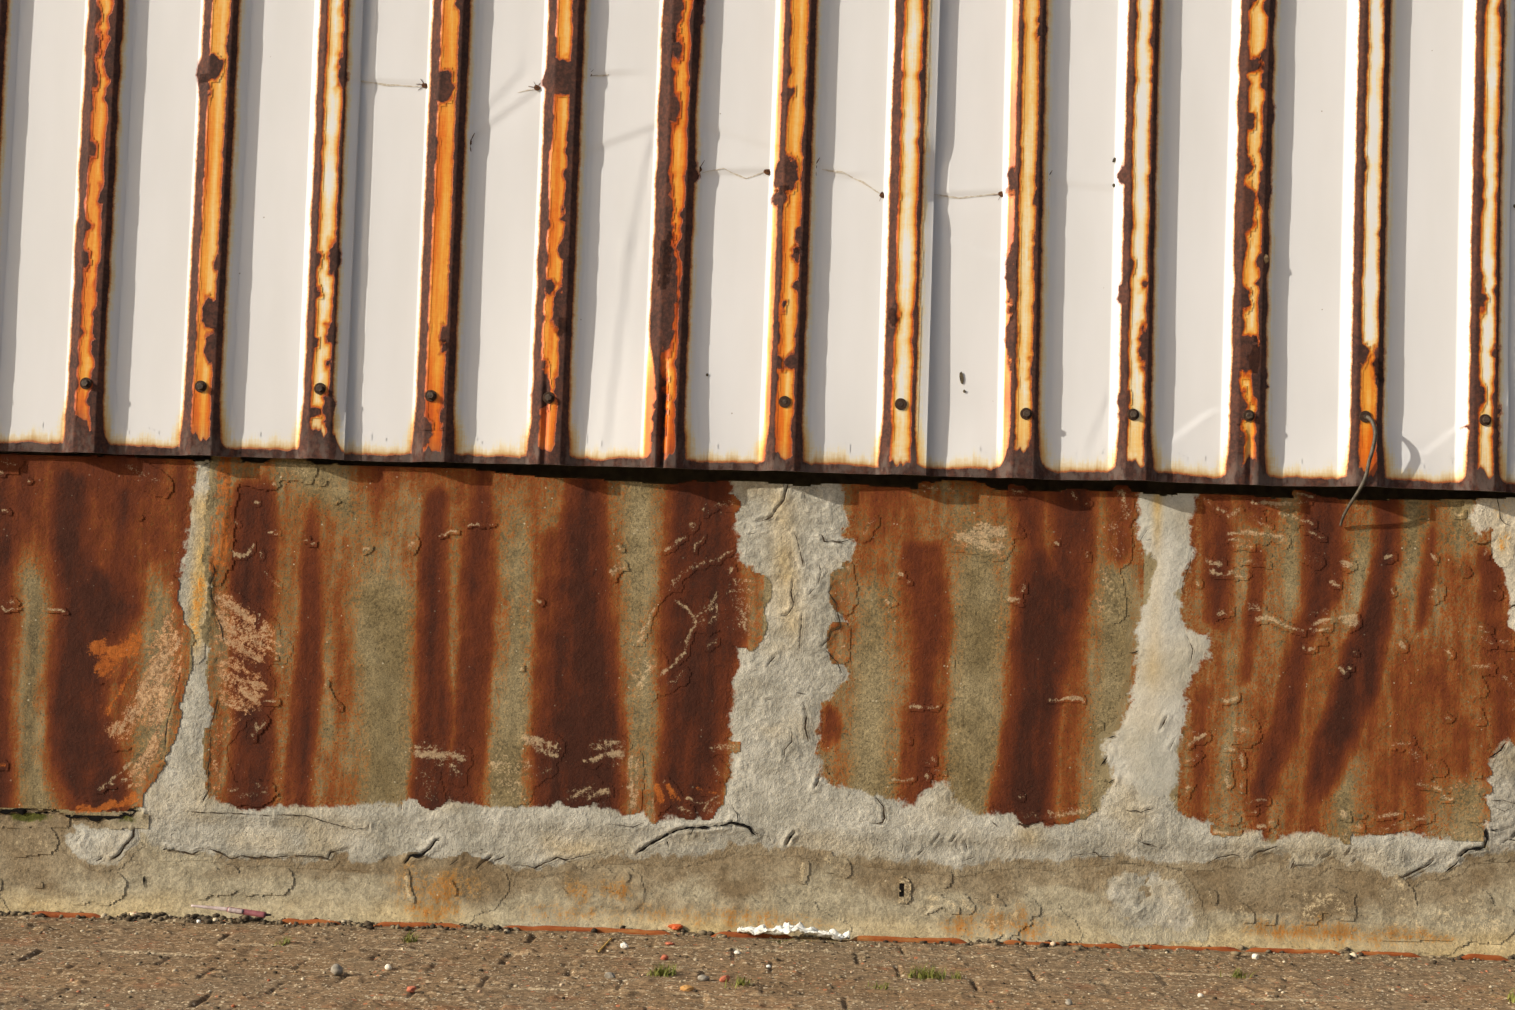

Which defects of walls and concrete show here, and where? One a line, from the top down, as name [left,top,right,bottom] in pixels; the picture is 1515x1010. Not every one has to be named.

rust [0,0,1515,805]
flaking render [1461,498,1493,543]
crack [0,700,794,887]
spalling [899,876,911,904]